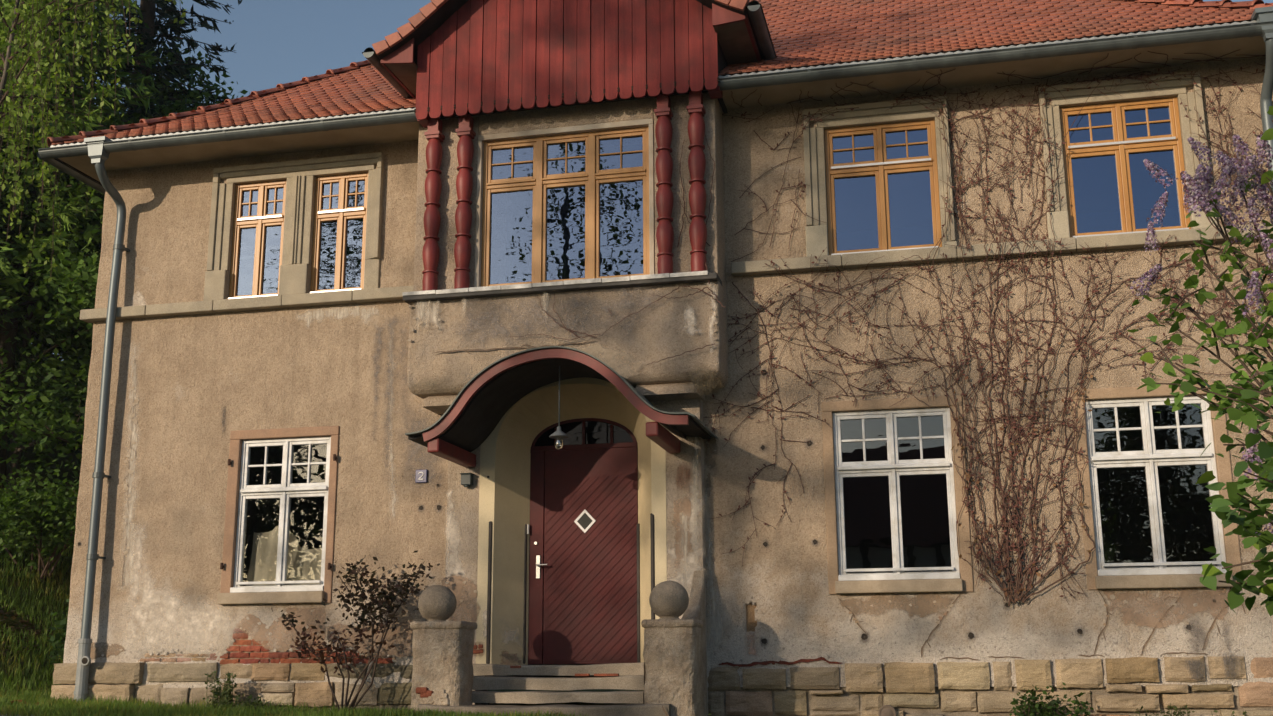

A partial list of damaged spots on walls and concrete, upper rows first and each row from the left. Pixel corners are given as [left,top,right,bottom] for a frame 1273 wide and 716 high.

flaking render [684,283,718,348]
flaking render [90,642,124,659]
flaking render [138,607,413,664]